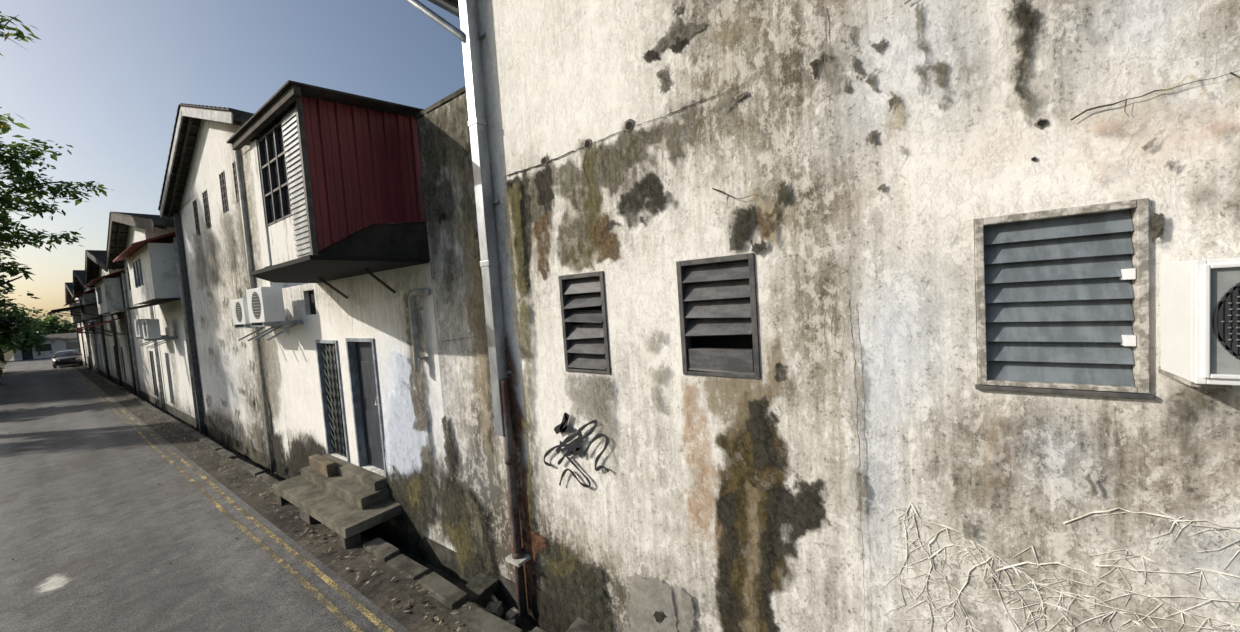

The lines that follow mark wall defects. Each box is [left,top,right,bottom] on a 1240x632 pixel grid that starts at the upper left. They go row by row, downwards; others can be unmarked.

damp [419,94,474,301]
corrosion [463,223,489,452]
damp [506,101,695,528]
damp [729,180,791,255]
damp [1002,0,1041,122]
crack [1070,70,1240,121]
corrosion [504,337,547,611]
damp [704,342,829,632]